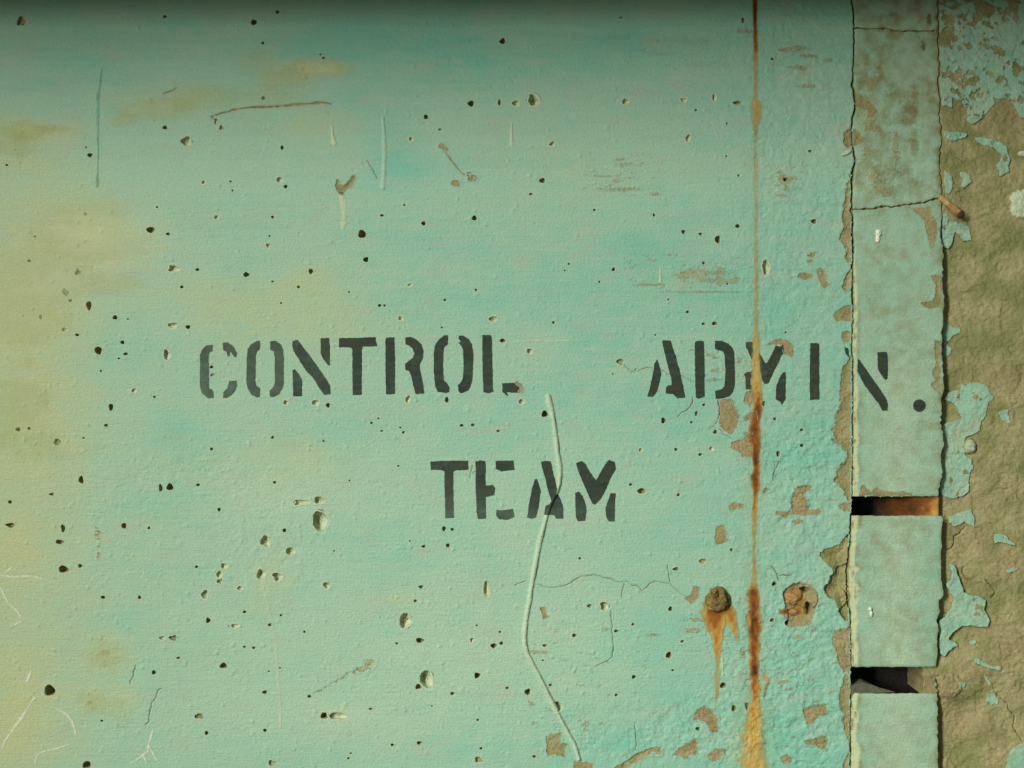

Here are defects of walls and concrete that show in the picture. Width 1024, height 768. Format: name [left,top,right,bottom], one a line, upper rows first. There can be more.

corrosion [751,89,761,127]
peeling [939,0,1024,177]
crack [849,0,942,491]
peeling [910,206,972,249]
spalling [829,304,914,513]
peeling [931,322,1012,499]
corrosion [702,274,769,768]
crack [844,516,852,664]
peeling [948,509,975,527]
peeling [937,563,1001,706]
crack [846,694,854,766]
peeling [1005,743,1024,768]